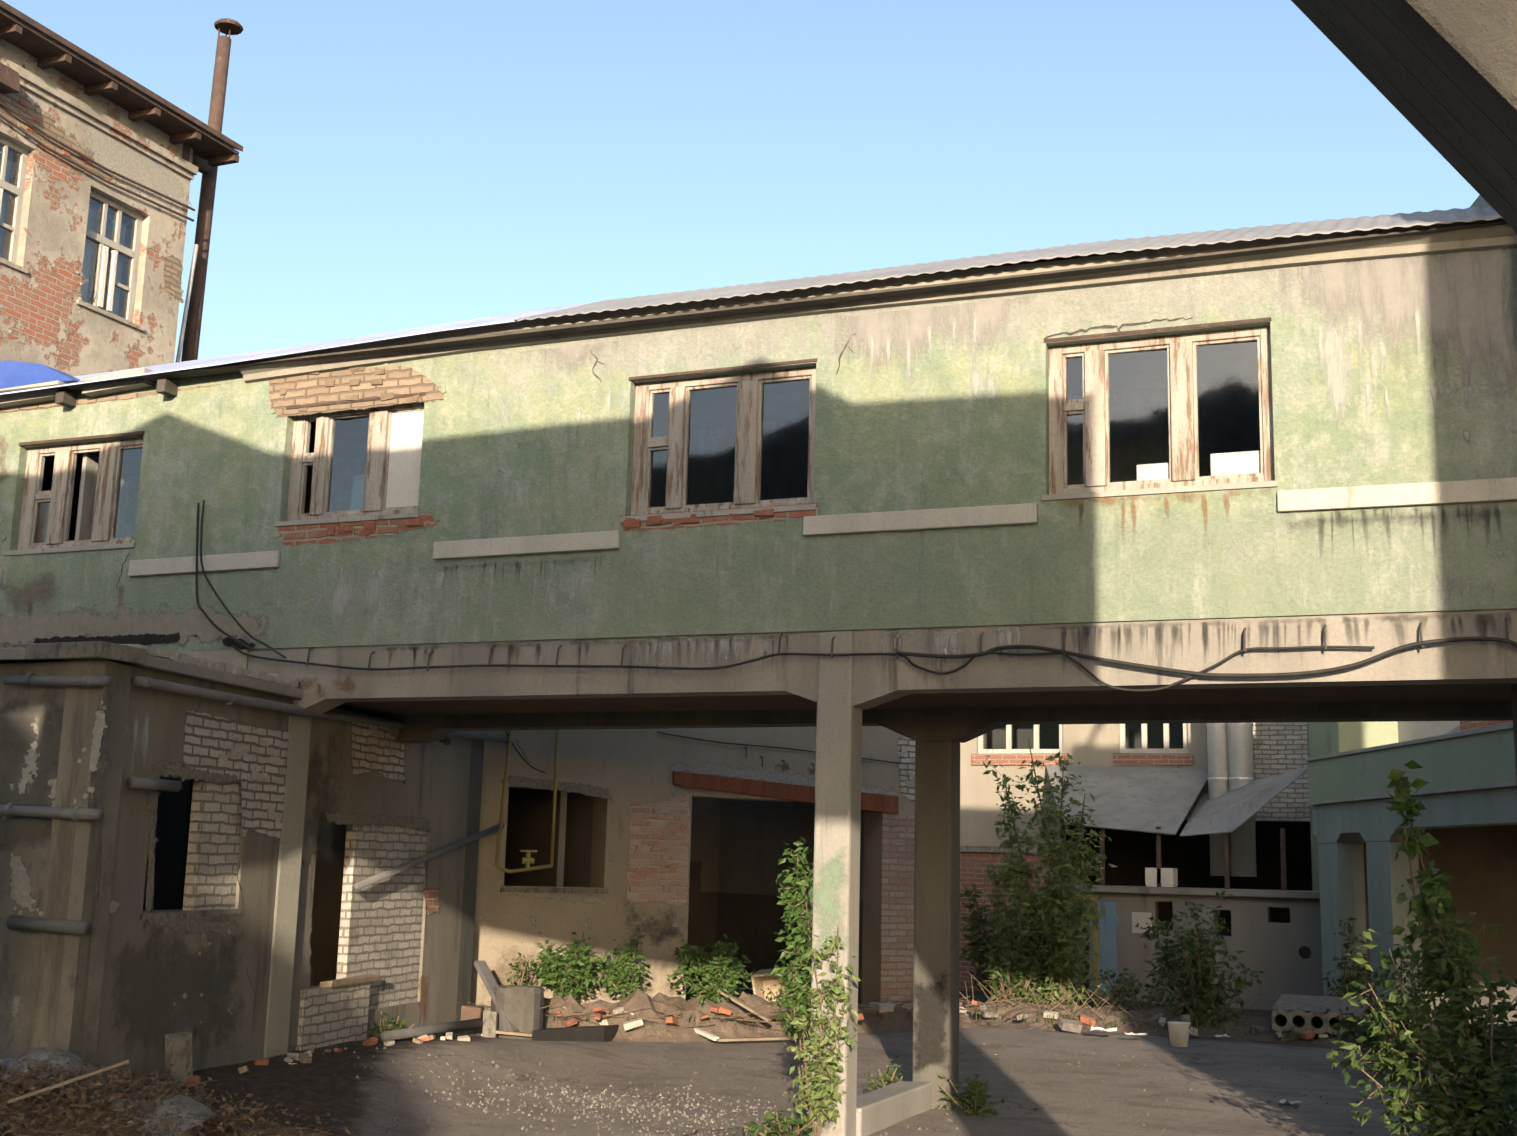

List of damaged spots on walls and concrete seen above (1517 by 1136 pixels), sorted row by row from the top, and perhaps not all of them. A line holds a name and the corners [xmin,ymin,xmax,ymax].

flaking render [0,89,192,211]
flaking render [164,256,184,303]
flaking render [0,247,92,368]
flaking render [269,363,446,418]
flaking render [274,513,438,546]
corrosion [1068,496,1135,518]
corrosion [1165,495,1228,515]
leakage [639,636,767,662]
peeling [9,718,57,820]
peeling [74,700,108,807]
leakage [115,933,240,1045]